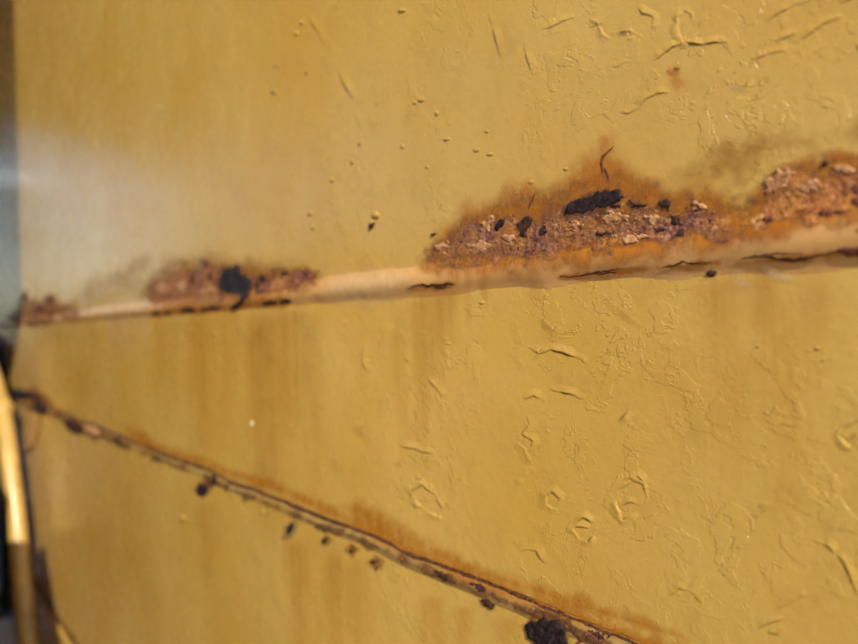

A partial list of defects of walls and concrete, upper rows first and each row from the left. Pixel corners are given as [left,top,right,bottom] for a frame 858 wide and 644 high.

corrosion [430,153,858,278]
corrosion [148,259,317,317]
corrosion [6,386,72,420]
corrosion [292,511,661,644]